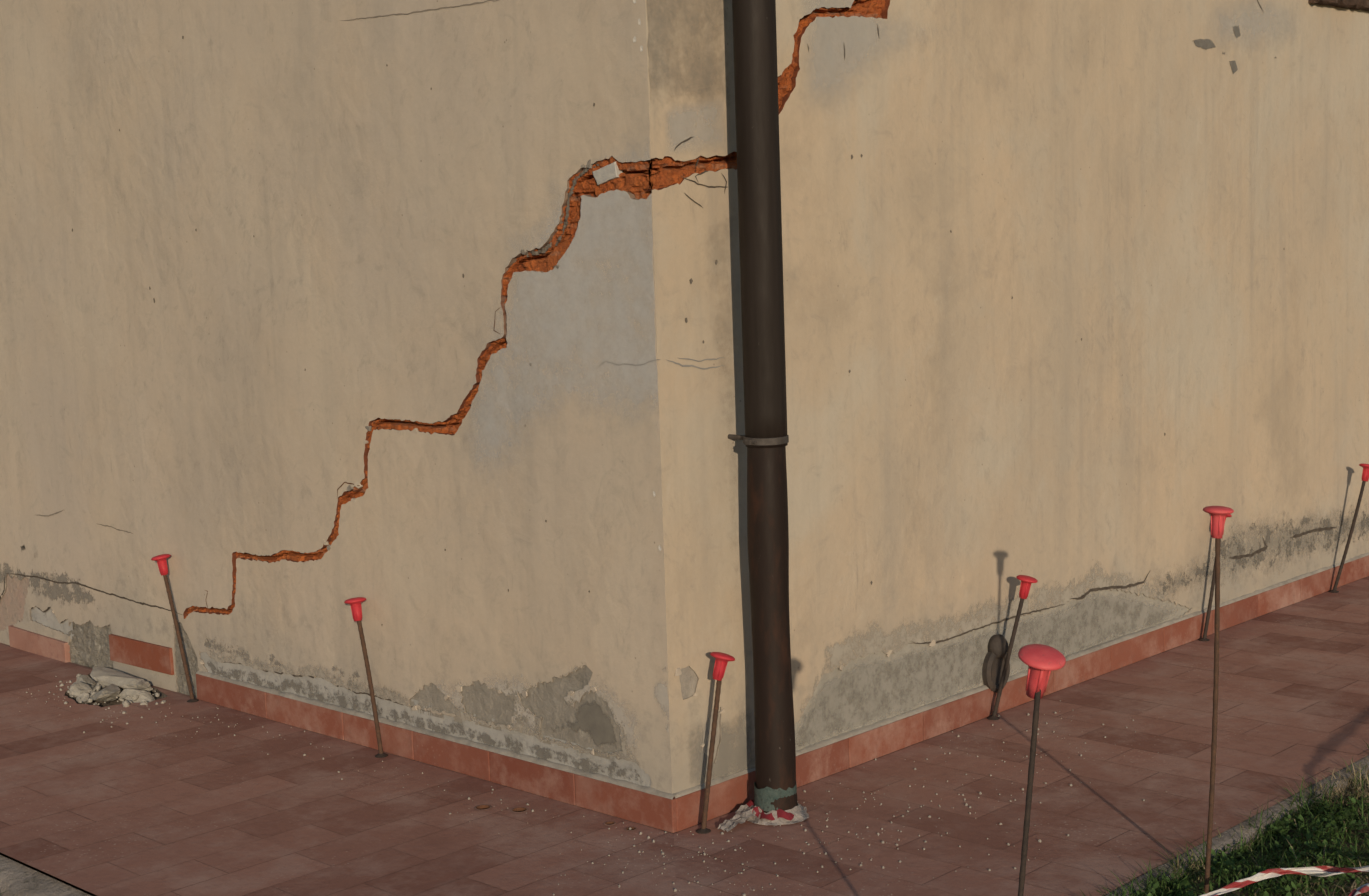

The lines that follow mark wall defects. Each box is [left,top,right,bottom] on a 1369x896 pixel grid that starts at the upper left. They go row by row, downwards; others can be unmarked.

crack [341,0,498,21]
crack [778,0,885,108]
crack [0,137,737,618]
leakage [1208,516,1369,572]
flaking render [31,606,125,707]
peeling [150,622,651,787]